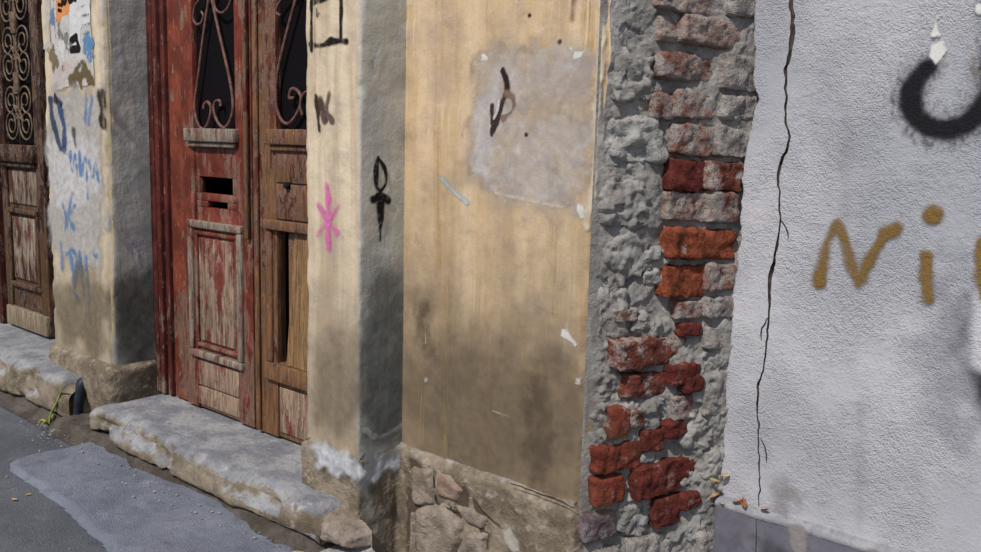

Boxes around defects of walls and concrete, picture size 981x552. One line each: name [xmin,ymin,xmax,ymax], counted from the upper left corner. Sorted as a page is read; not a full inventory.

spalling [467,0,759,552]
crack [755,0,796,552]
peeling [929,16,947,64]